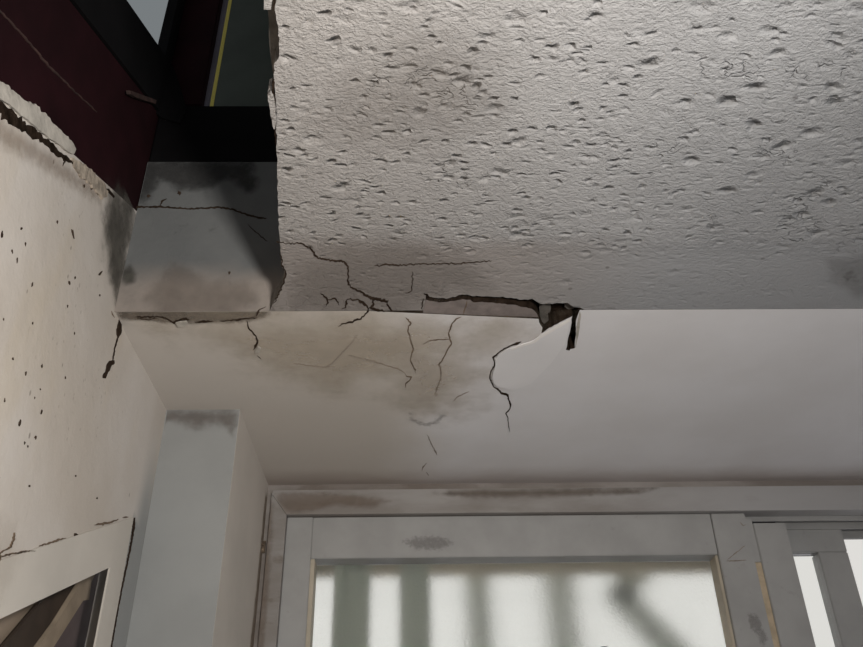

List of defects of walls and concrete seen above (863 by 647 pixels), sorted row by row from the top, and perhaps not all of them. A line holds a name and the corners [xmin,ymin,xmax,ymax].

flaking render [0,82,108,200]
crack [136,199,491,401]
crack [489,342,521,431]
peeling [492,302,581,391]
crack [0,533,66,561]
crack [96,516,135,647]